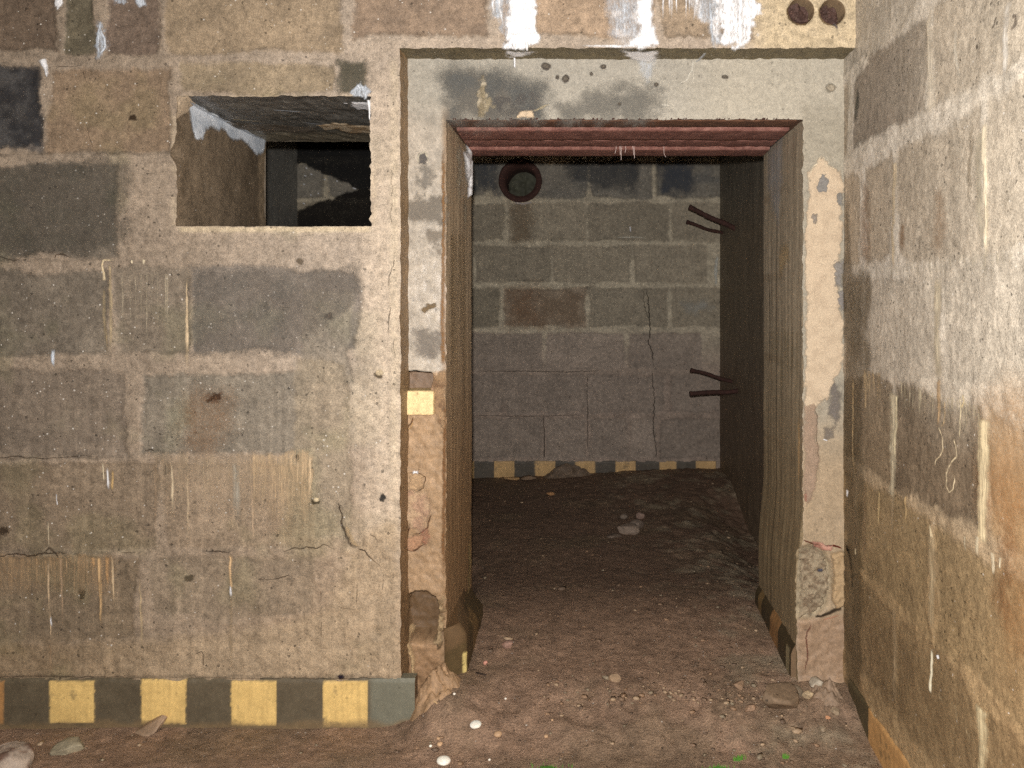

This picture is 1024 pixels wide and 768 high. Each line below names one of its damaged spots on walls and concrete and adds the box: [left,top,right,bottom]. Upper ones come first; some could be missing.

water stain [492,0,540,67]
water stain [595,0,761,68]
peeling [803,157,844,503]
crack [289,504,377,564]
spalling [799,547,829,618]
spalling [407,624,415,673]
spalling [433,597,445,649]